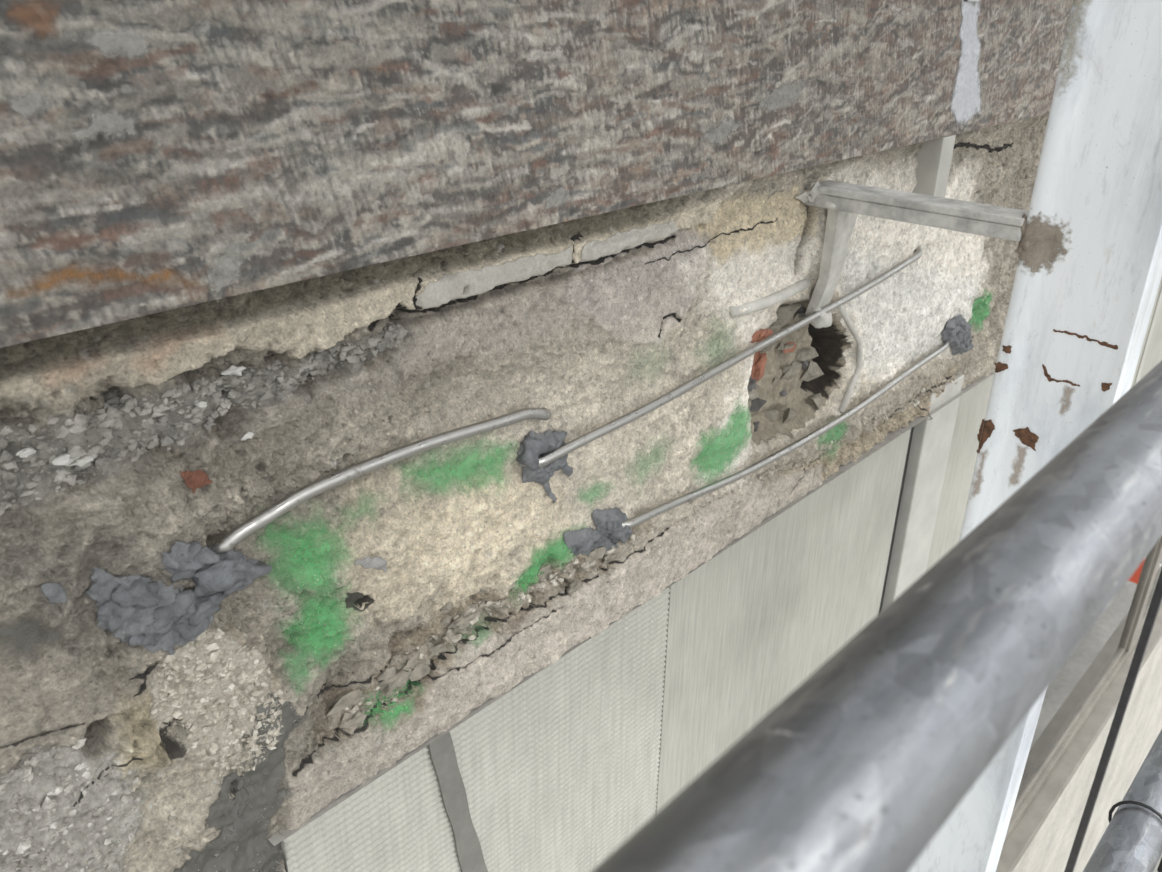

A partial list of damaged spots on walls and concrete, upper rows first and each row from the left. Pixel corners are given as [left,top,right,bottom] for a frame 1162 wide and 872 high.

peeling [72,111,136,142]
crack [953,142,1013,153]
peeling [208,255,242,292]
peeling [416,221,678,309]
crack [369,218,778,338]
spalling [0,324,412,516]
spalling [206,407,552,554]
spalling [325,245,957,735]
corrosion [1011,447,1025,484]
corrosion [1061,388,1072,414]
crack [292,528,669,777]
spalling [150,628,287,800]